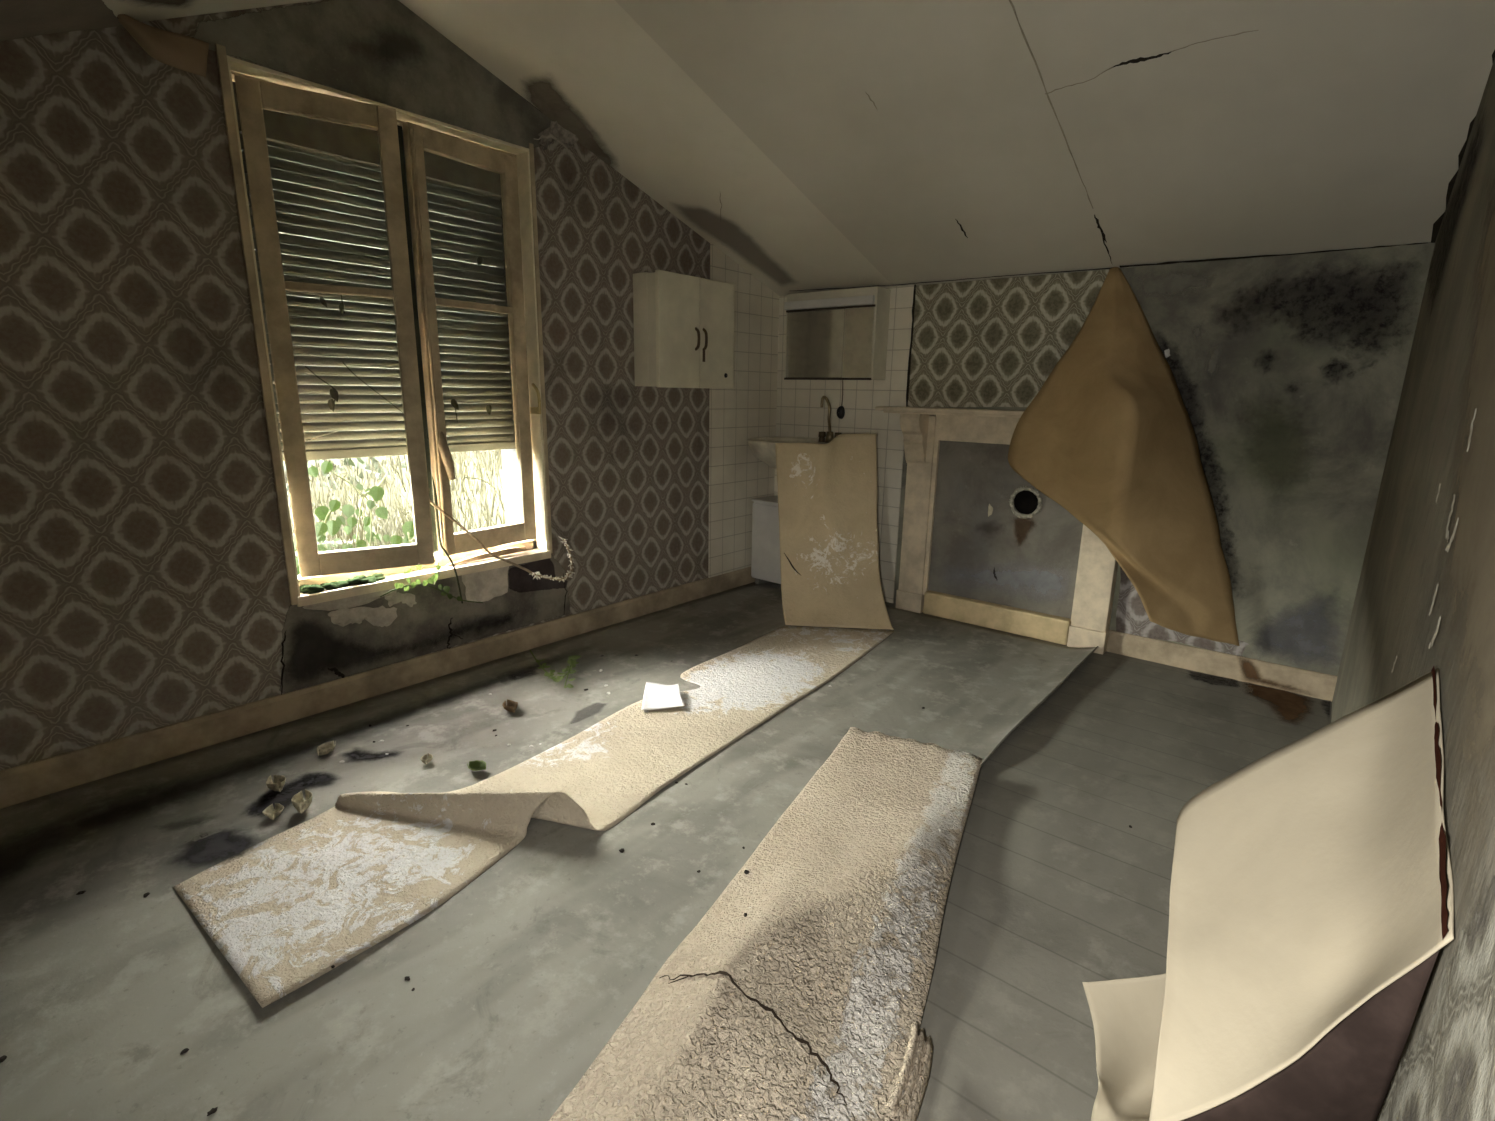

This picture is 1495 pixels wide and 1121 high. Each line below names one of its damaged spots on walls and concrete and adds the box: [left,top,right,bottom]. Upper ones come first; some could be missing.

crack [796,0,1476,291]
water stain [1223,266,1407,350]
peeling [1008,267,1239,646]
water stain [1159,337,1237,589]
flaking render [280,555,570,693]
water stain [1256,599,1335,662]
peeling [1149,669,1454,1121]